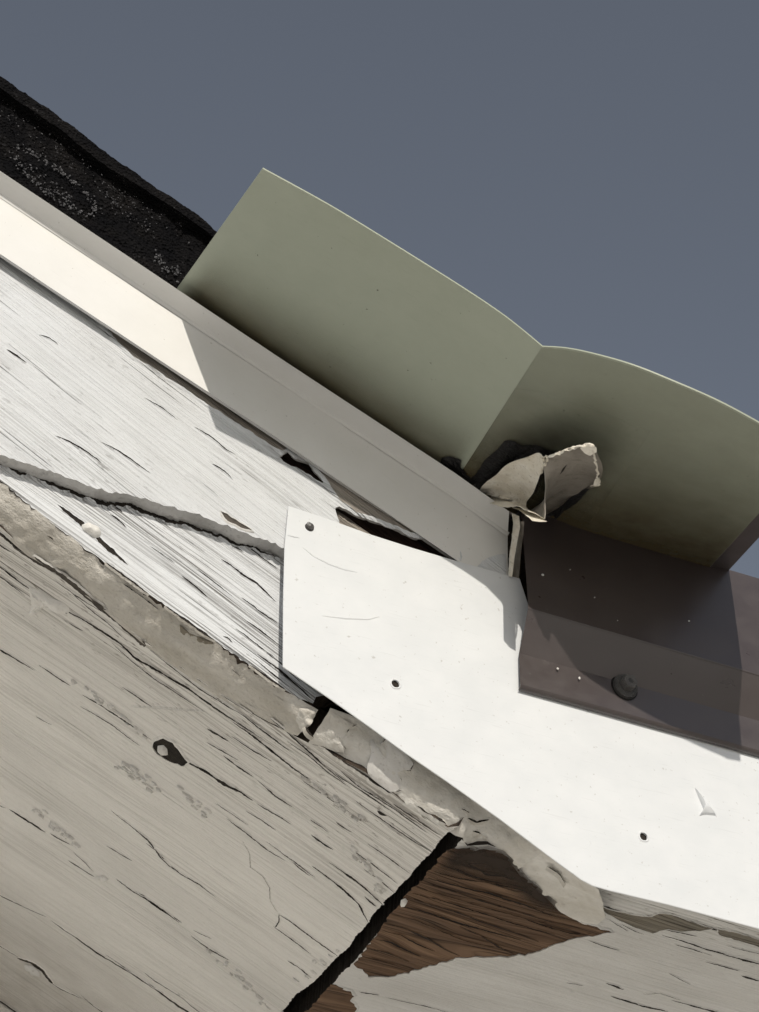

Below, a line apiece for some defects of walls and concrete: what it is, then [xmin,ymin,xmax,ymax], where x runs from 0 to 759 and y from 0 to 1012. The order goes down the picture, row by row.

peeling [95,320,425,539]
peeling [580,446,597,456]
crack [0,464,312,700]
peeling [296,707,316,732]
peeling [325,711,357,753]
crack [0,530,759,981]
peeling [367,738,414,794]
peeling [354,846,759,978]
peeling [304,984,359,1012]
crack [359,991,451,1012]
crack [566,973,721,1012]